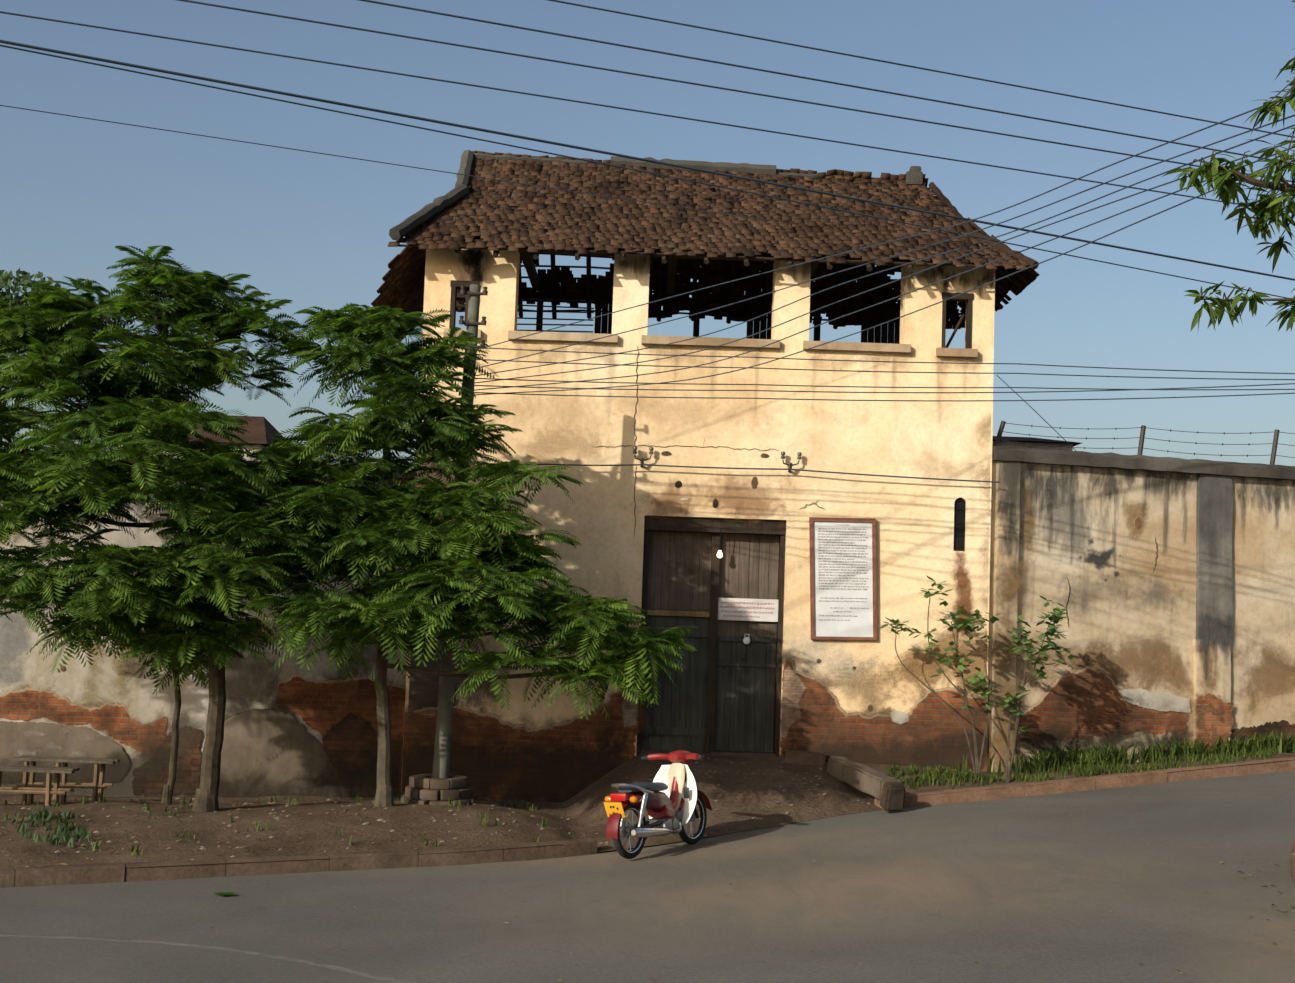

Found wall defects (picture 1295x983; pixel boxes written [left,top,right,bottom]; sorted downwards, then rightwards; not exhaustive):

rust [952,553,972,636]
water stain [903,446,1190,772]
water stain [1197,615,1233,675]
spalling [0,687,202,796]
spalling [273,674,642,800]
spalling [780,646,991,772]
spalling [1015,666,1295,756]